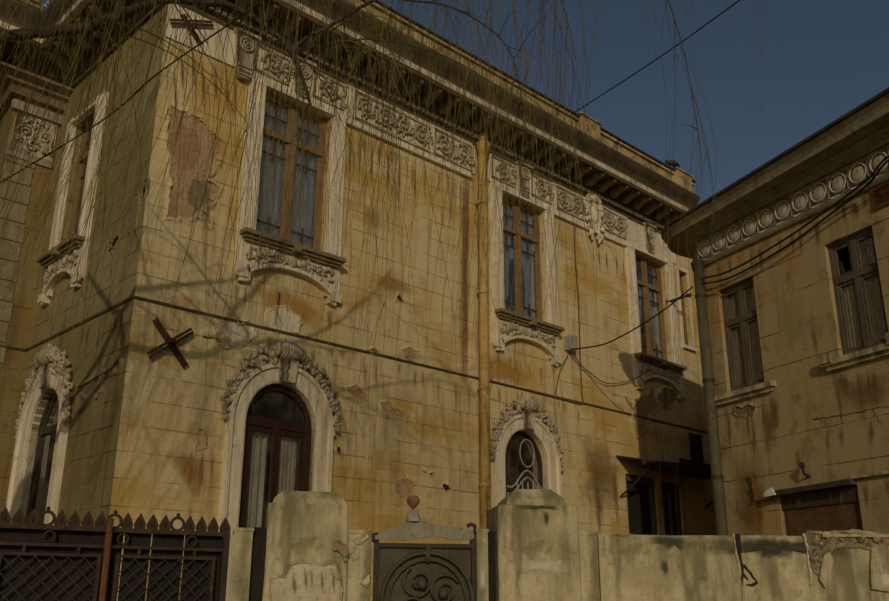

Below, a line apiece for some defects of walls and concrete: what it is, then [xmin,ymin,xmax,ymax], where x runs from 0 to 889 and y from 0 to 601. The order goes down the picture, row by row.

flaking render [160,101,226,233]
peeling [211,305,304,350]
flaking render [621,385,663,441]
crack [813,406,885,423]
spalling [806,529,889,592]